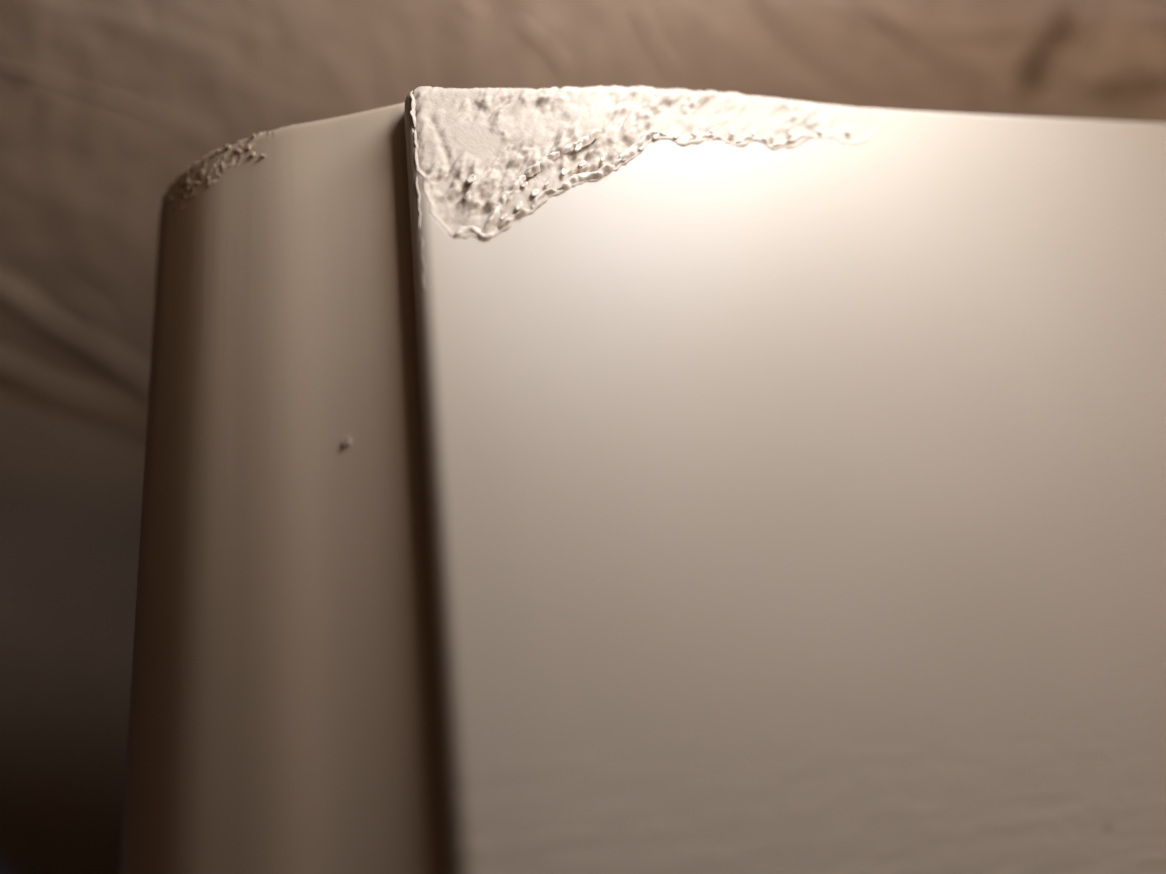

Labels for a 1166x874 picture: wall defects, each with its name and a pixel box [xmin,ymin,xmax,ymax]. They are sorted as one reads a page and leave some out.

peeling [162,124,295,215]
spalling [410,85,883,292]